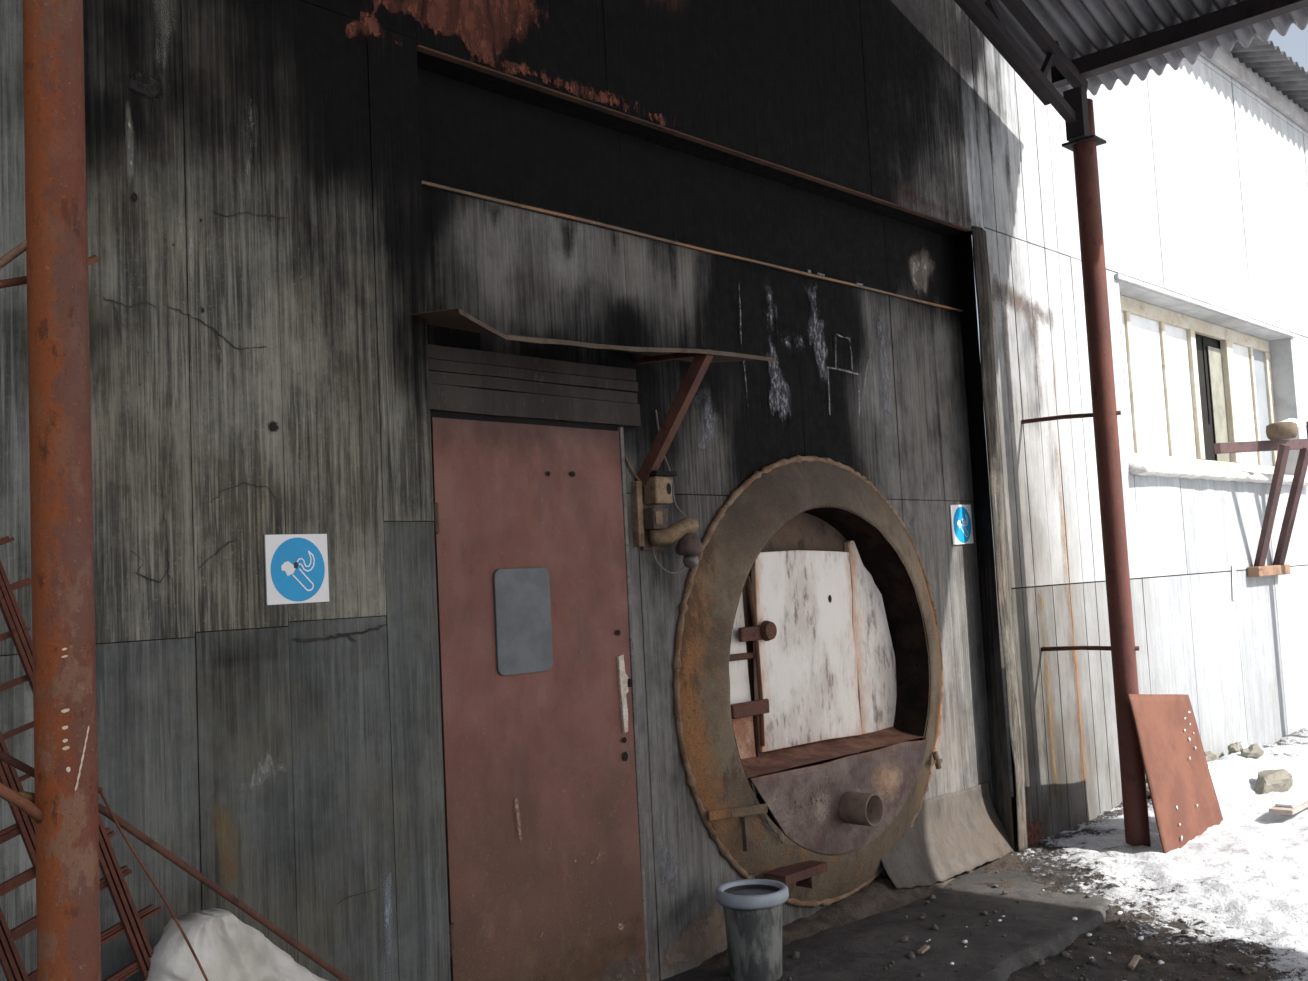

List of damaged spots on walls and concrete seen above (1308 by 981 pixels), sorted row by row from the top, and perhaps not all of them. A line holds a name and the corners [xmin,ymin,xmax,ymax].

rust [469,44,630,112]
leakage [563,222,574,257]
crack [103,296,267,369]
crack [294,624,388,642]